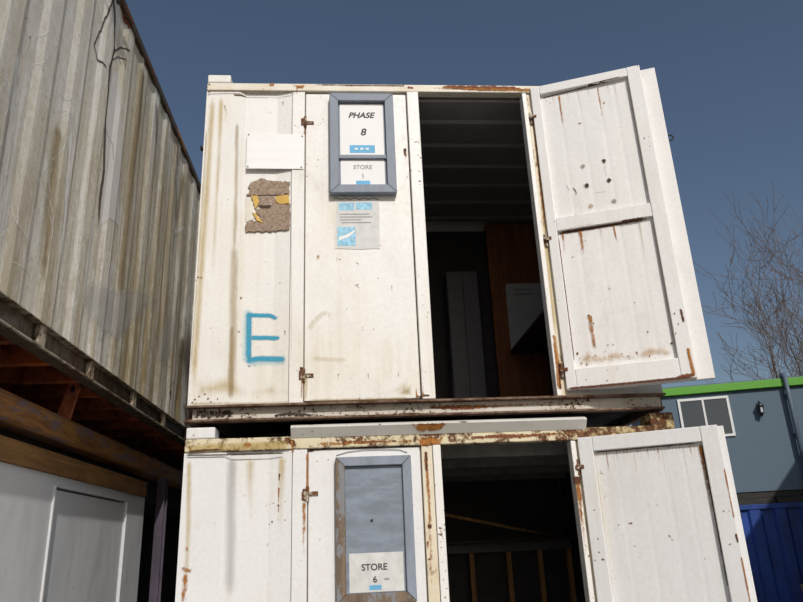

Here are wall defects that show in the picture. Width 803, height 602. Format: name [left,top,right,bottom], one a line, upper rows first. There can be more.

damp [0,0,76,286]
damp [129,75,144,206]
peeling [245,178,291,233]
rust [533,121,545,222]
rust [558,217,646,357]
rust [553,335,695,390]
rust [306,423,445,560]
rust [573,476,582,519]
rust [596,443,739,585]